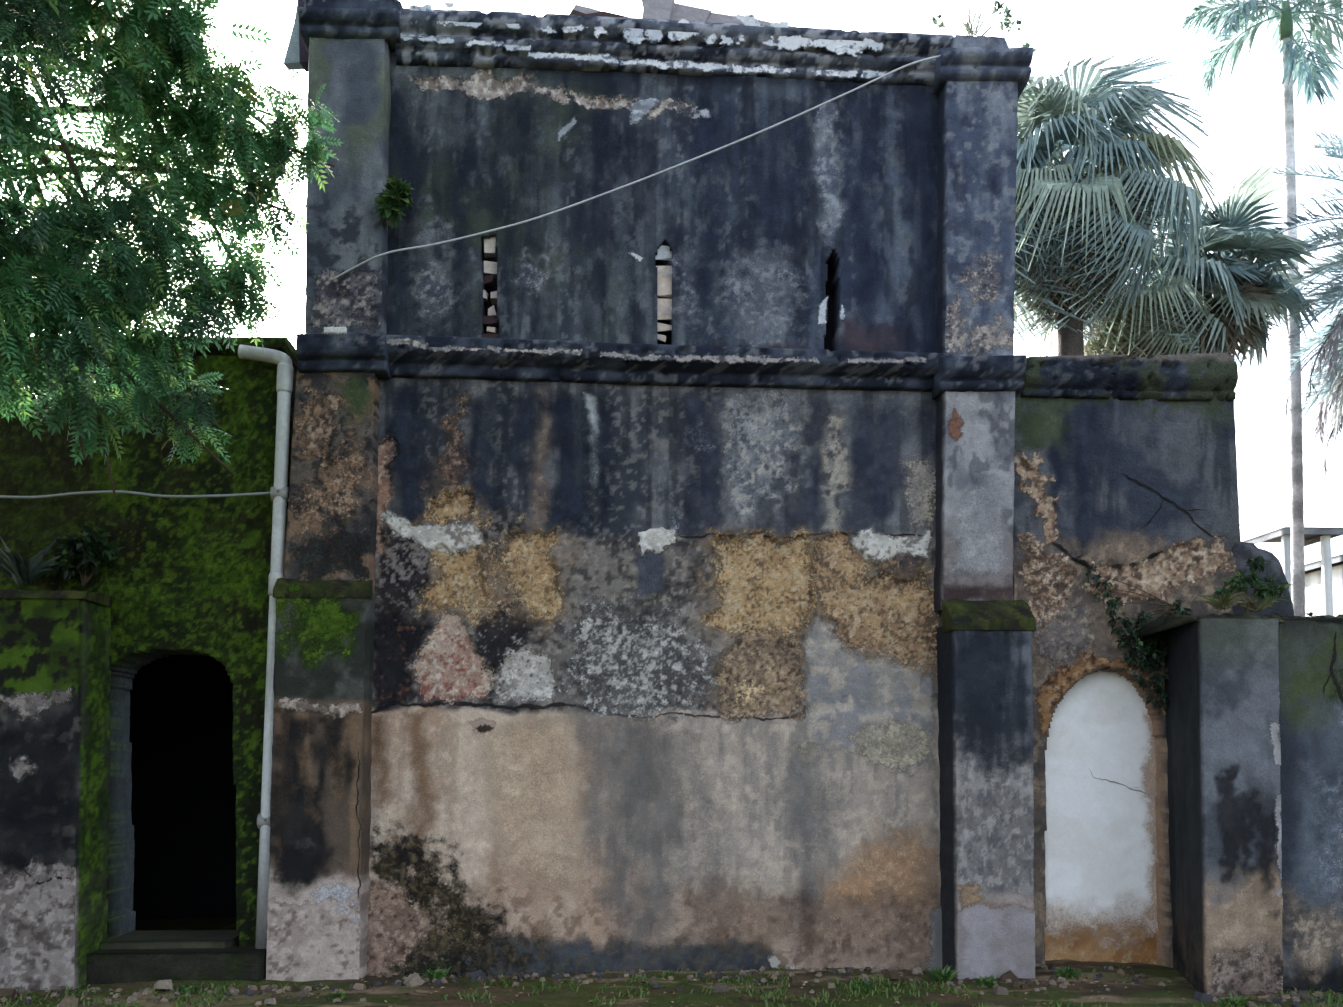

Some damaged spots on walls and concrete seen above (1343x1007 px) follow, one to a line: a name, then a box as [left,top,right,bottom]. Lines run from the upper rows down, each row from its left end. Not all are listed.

water stain [395,90,555,331]
spalling [410,68,710,142]
peeling [401,1,886,78]
water stain [668,94,884,349]
flaking render [945,254,1014,356]
spalling [278,386,939,776]
water stain [292,382,937,977]
spalling [953,452,1237,734]
crack [1051,473,1217,569]
crack [1323,632,1343,702]
water stain [269,708,356,887]
water stain [1207,765,1343,996]